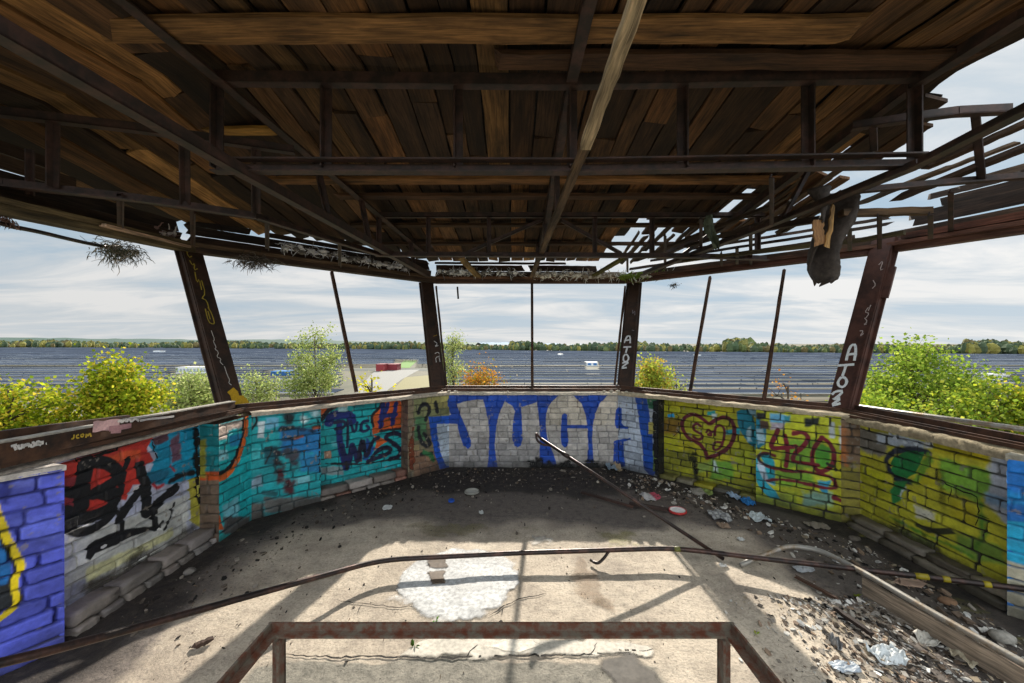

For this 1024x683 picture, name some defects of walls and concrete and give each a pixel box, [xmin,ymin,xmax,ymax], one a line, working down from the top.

crack [290,643,653,660]